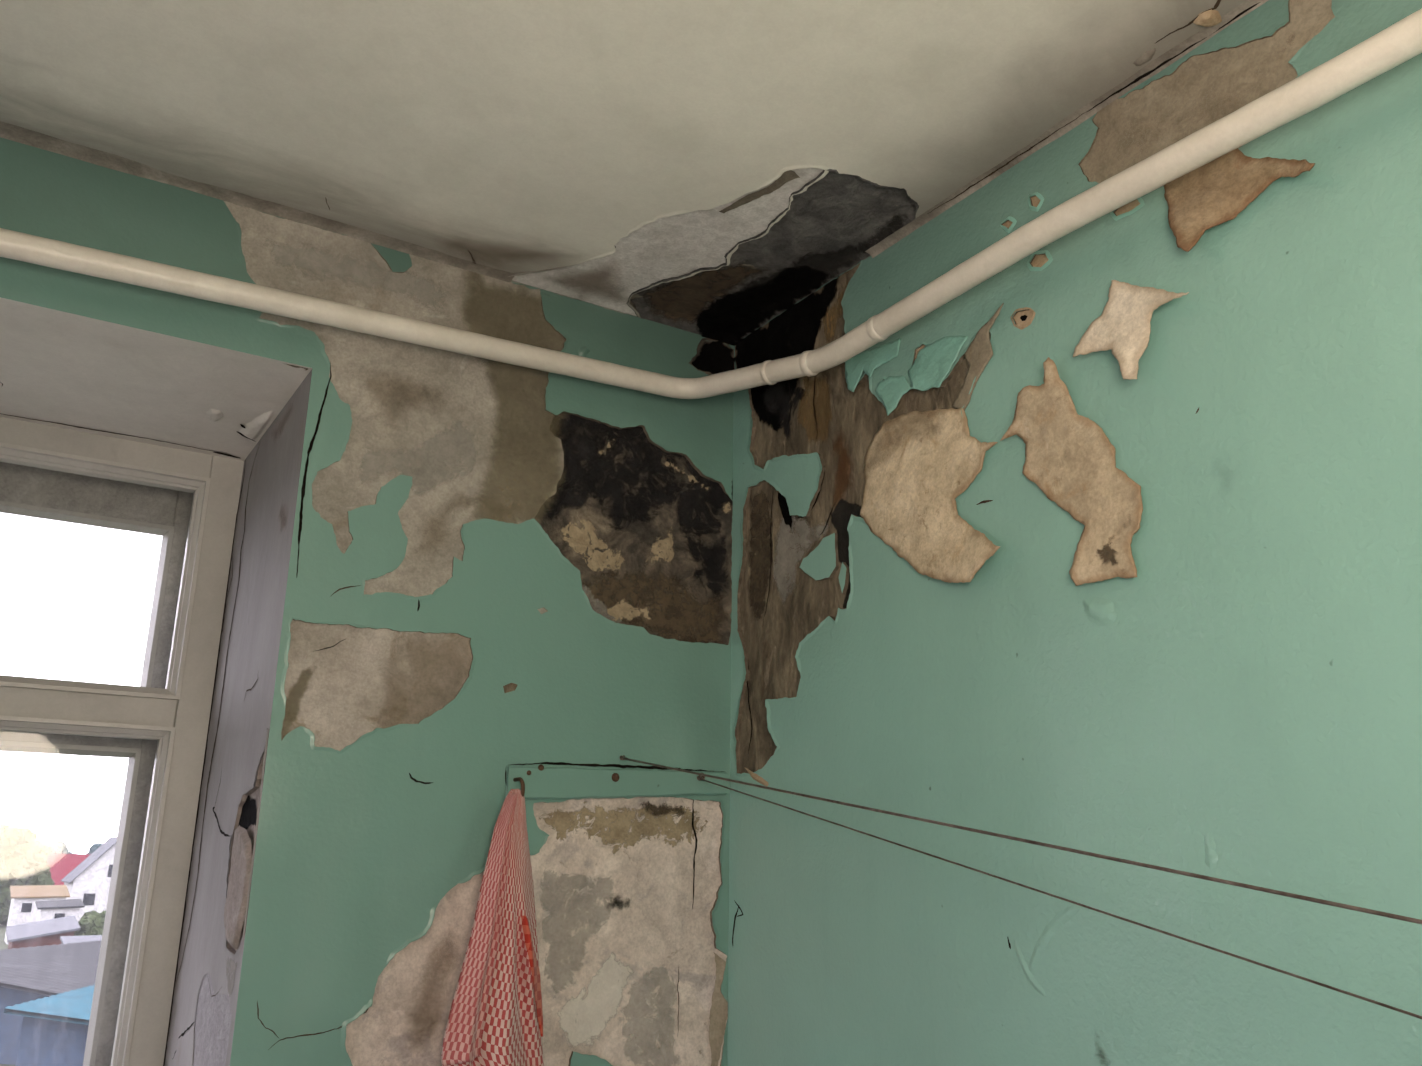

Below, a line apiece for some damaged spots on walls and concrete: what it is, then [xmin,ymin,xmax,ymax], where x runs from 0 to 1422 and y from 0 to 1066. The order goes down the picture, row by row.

flaking render [1076,0,1337,184]
flaking render [222,164,919,375]
damp [695,215,903,346]
peeling [1110,197,1145,221]
peeling [1073,280,1189,380]
peeling [1164,146,1315,252]
peeling [237,411,274,442]
flaking render [255,303,1143,777]
crack [0,382,259,1066]
flaking render [173,617,485,1066]
flaking render [530,795,729,1066]